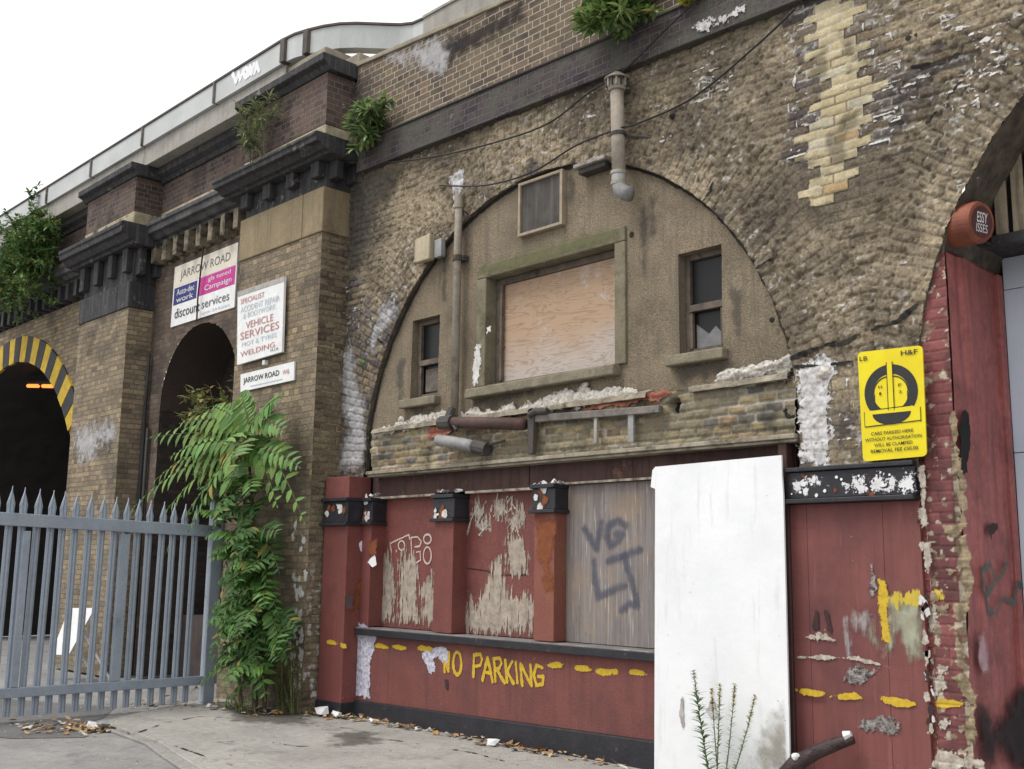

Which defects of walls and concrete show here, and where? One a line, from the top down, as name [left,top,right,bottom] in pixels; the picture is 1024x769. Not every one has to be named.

water stain [354,305,395,351]
water stain [74,420,116,462]
water stain [340,348,365,468]
spalling [460,382,682,418]
peeling [688,353,929,528]
peeling [382,546,434,627]
peeling [465,478,565,638]
rust [535,518,556,590]
spalling [919,410,985,769]
spalling [807,610,835,642]
spalling [843,665,880,685]
peeling [857,714,902,736]